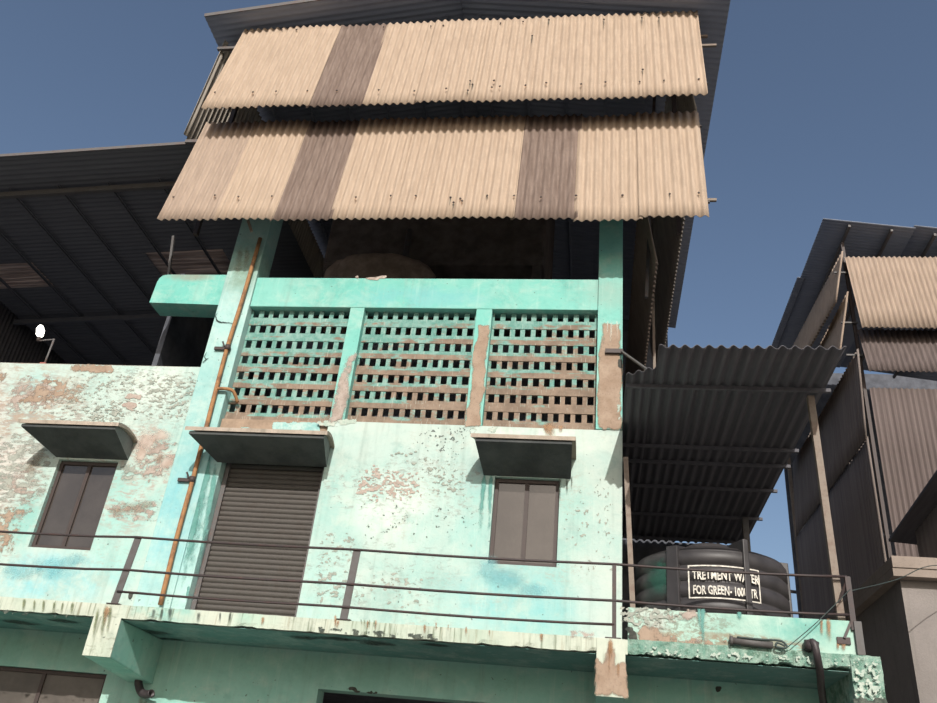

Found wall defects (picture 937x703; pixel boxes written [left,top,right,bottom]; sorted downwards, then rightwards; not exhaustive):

peeling [7,364,196,422]
peeling [272,353,357,431]
peeling [597,323,623,430]
peeling [121,431,175,483]
peeling [354,325,497,533]
peeling [0,433,50,553]
peeling [108,502,156,521]
peeling [620,606,753,661]
peeling [594,649,628,698]
spalling [828,658,887,703]